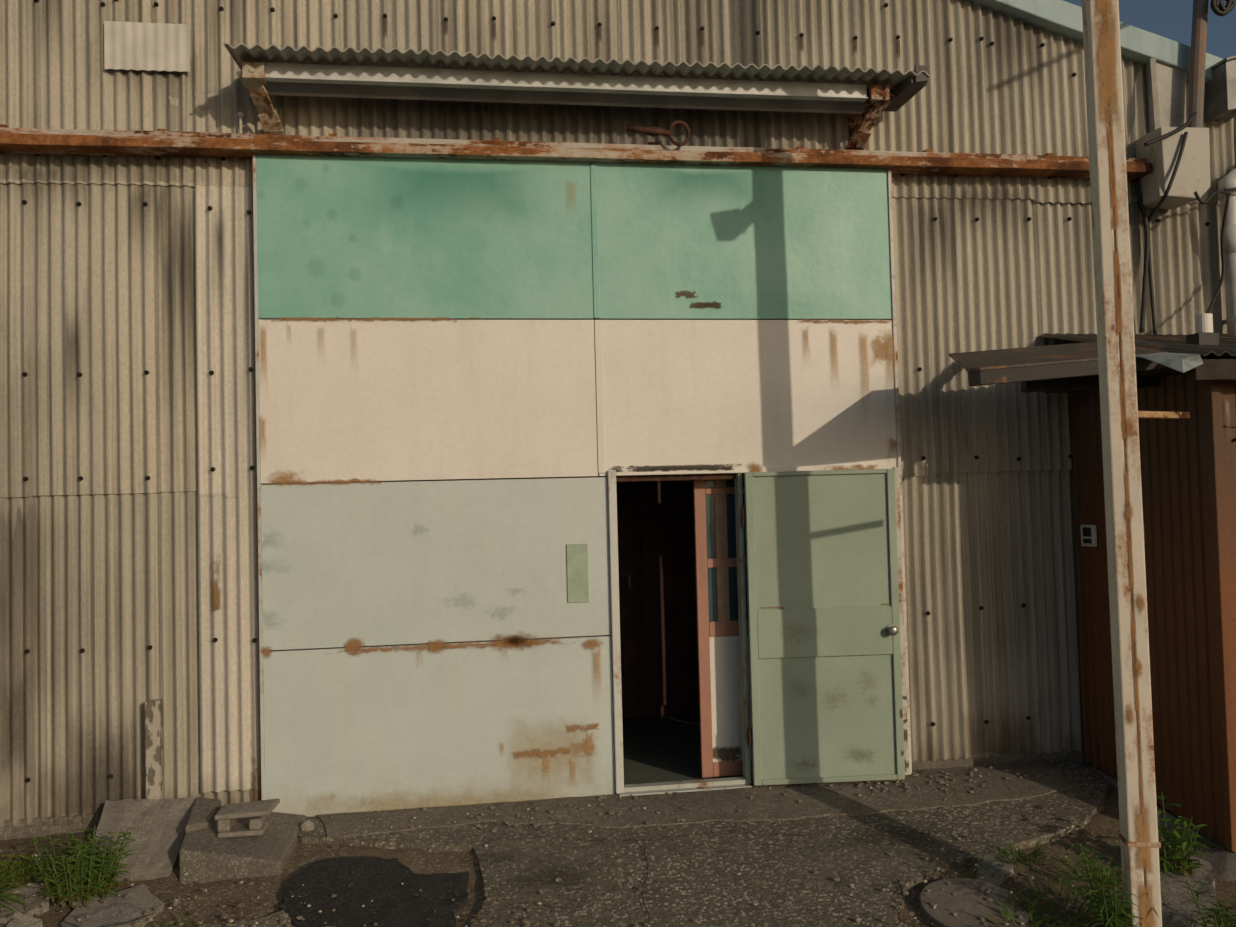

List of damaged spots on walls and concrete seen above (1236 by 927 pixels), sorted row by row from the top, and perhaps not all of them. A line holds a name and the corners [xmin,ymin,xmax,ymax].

rust [1096,0,1119,229]
rust [1114,250,1122,334]
damp [66,330,80,372]
rust [801,319,894,362]
rust [1119,364,1134,439]
rust [273,474,381,485]
damp [7,510,25,603]
rust [345,634,558,654]
rust [1124,465,1160,927]
damp [91,744,129,815]
rust [501,724,598,773]